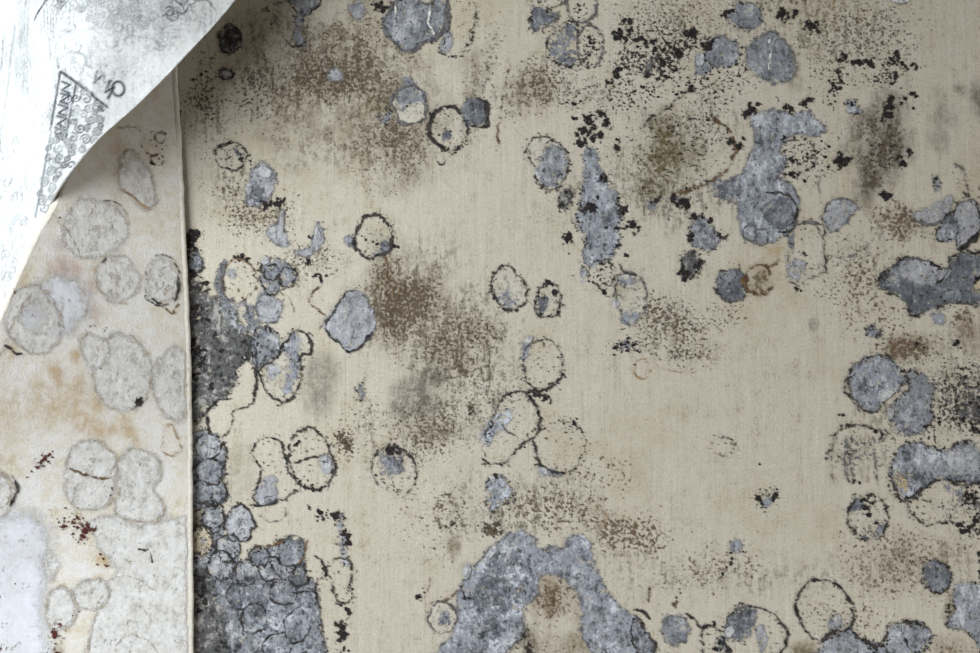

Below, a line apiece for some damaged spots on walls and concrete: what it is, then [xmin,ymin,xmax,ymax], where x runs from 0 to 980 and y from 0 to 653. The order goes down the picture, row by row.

damp [180,0,437,286]
peeling [523,133,624,270]
damp [462,0,980,458]
peeling [706,97,827,248]
peeling [877,197,980,326]
peeling [0,149,377,653]
damp [329,230,560,474]
peeling [843,325,980,503]
damp [334,584,355,653]
peeling [426,529,692,653]
damp [392,454,775,596]
damp [834,486,980,640]